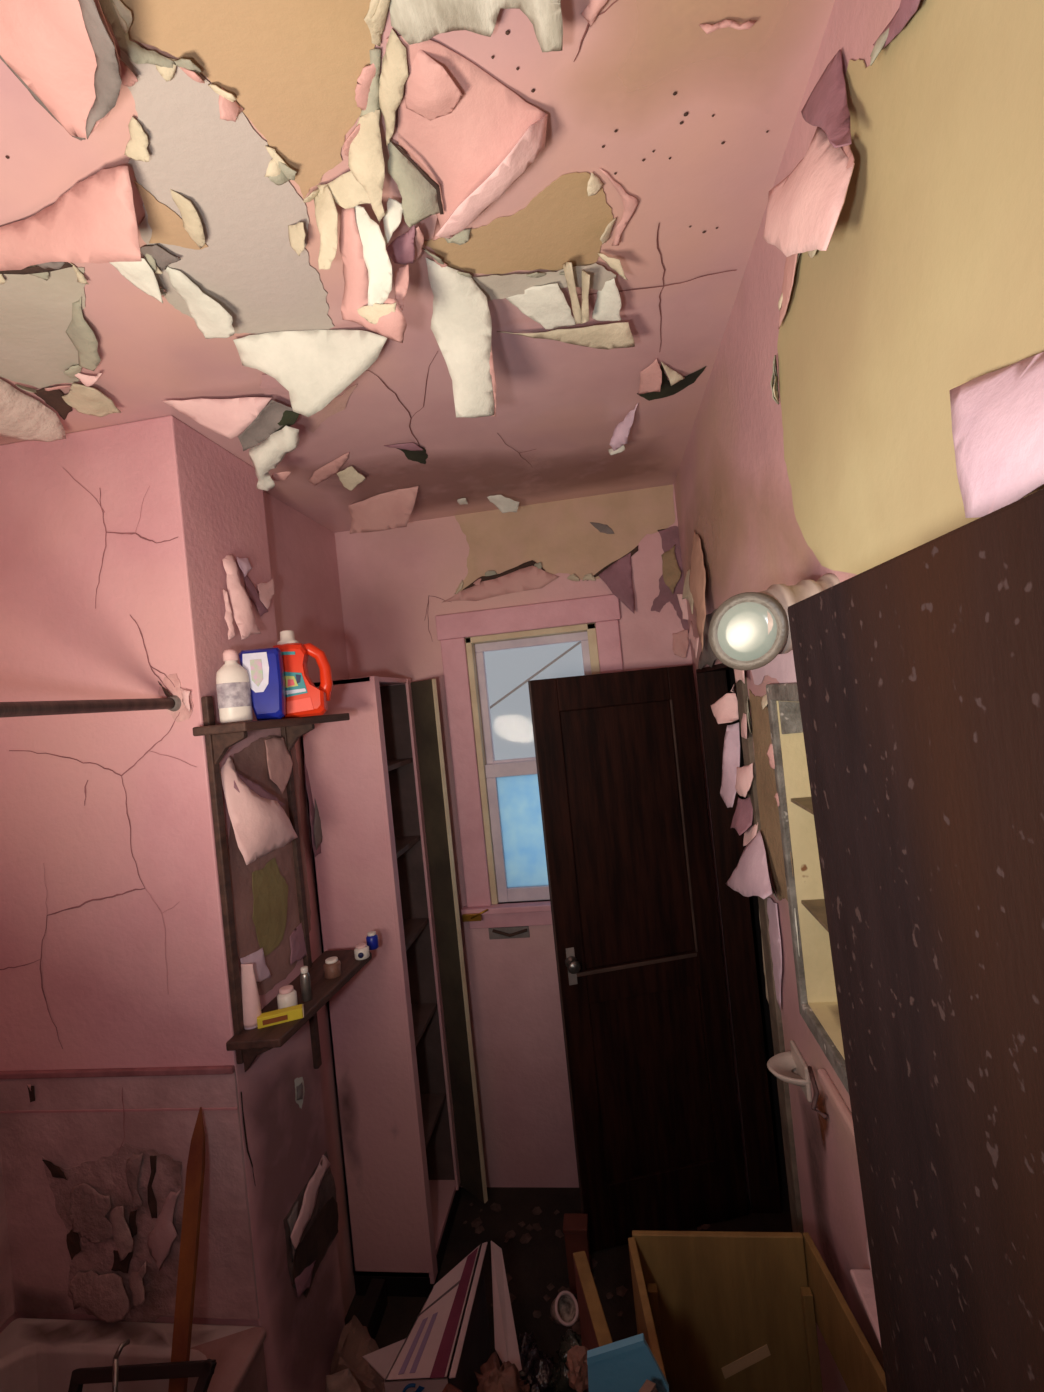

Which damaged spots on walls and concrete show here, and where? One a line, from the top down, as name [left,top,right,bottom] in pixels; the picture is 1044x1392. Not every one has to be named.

peeling [0,0,638,491]
peeling [763,0,1044,575]
crack [63,468,178,609]
peeling [222,554,275,640]
peeling [308,453,418,534]
crack [366,351,438,446]
peeling [443,484,718,669]
peeling [608,359,684,455]
crack [0,615,196,1049]
peeling [220,735,322,995]
peeling [711,650,800,1011]
spalling [42,1143,184,1323]